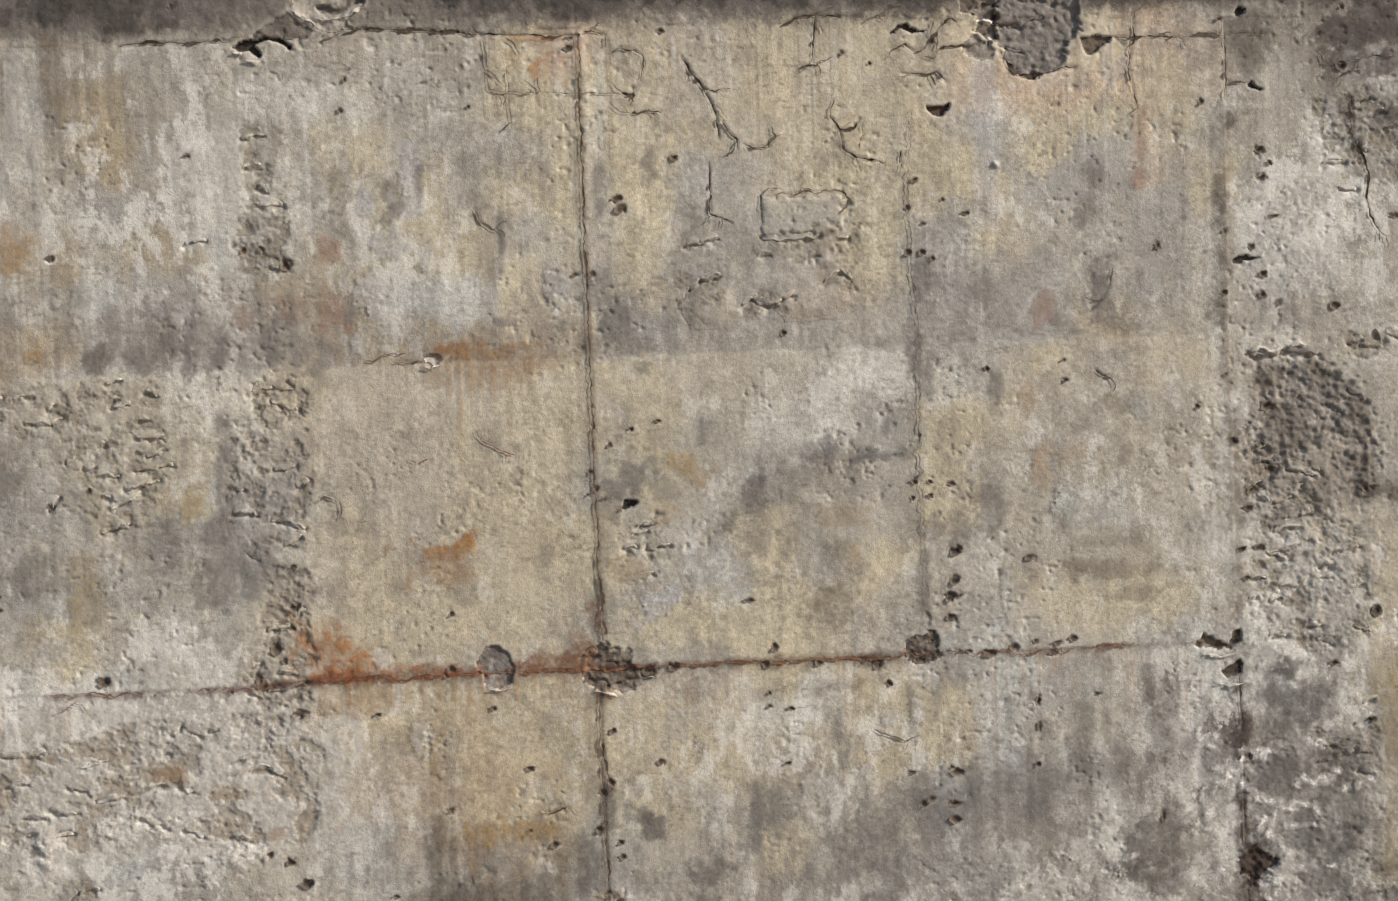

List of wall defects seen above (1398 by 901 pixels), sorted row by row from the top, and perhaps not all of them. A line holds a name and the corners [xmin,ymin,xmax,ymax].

spalling [232,0,364,65]
crack [322,22,661,131]
crack [681,3,1074,227]
spalling [960,0,1112,79]
crack [1318,53,1393,242]
crack [475,210,507,238]
spalling [1228,341,1383,666]
rust [280,632,481,697]
spalling [1239,845,1280,887]